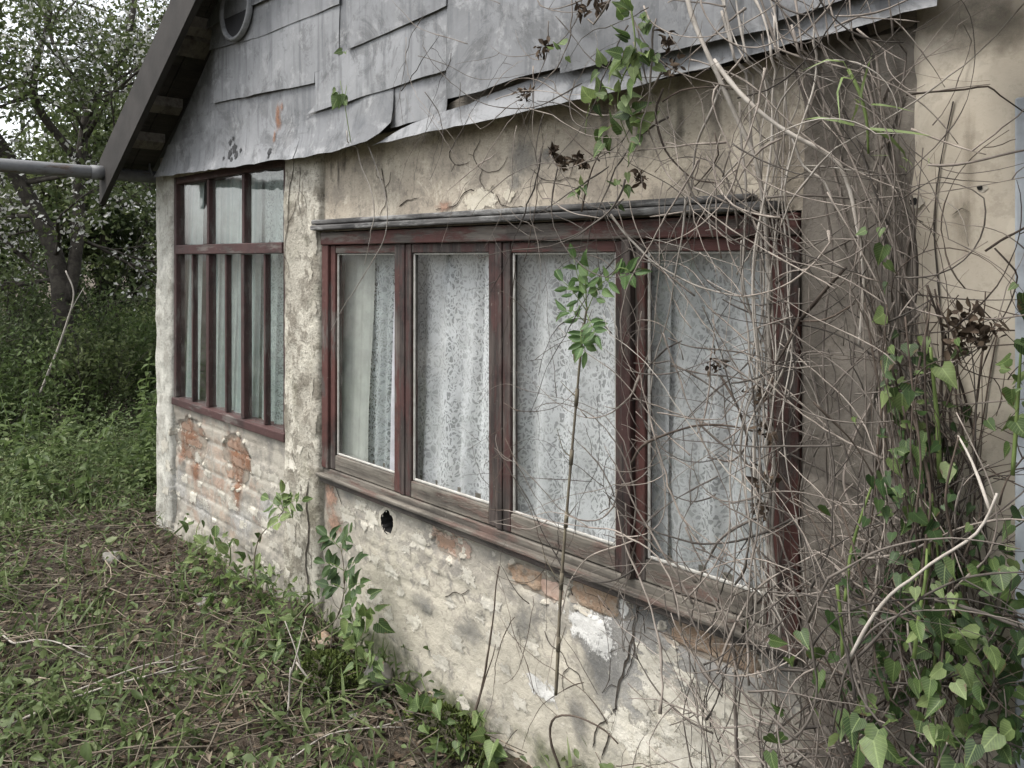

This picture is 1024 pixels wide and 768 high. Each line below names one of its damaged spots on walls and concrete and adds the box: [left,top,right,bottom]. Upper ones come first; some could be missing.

peeling [308,206,317,281]
peeling [310,412,318,438]
peeling [160,414,308,600]
peeling [355,544,457,633]
peeling [401,526,558,737]
flaking render [505,558,634,662]